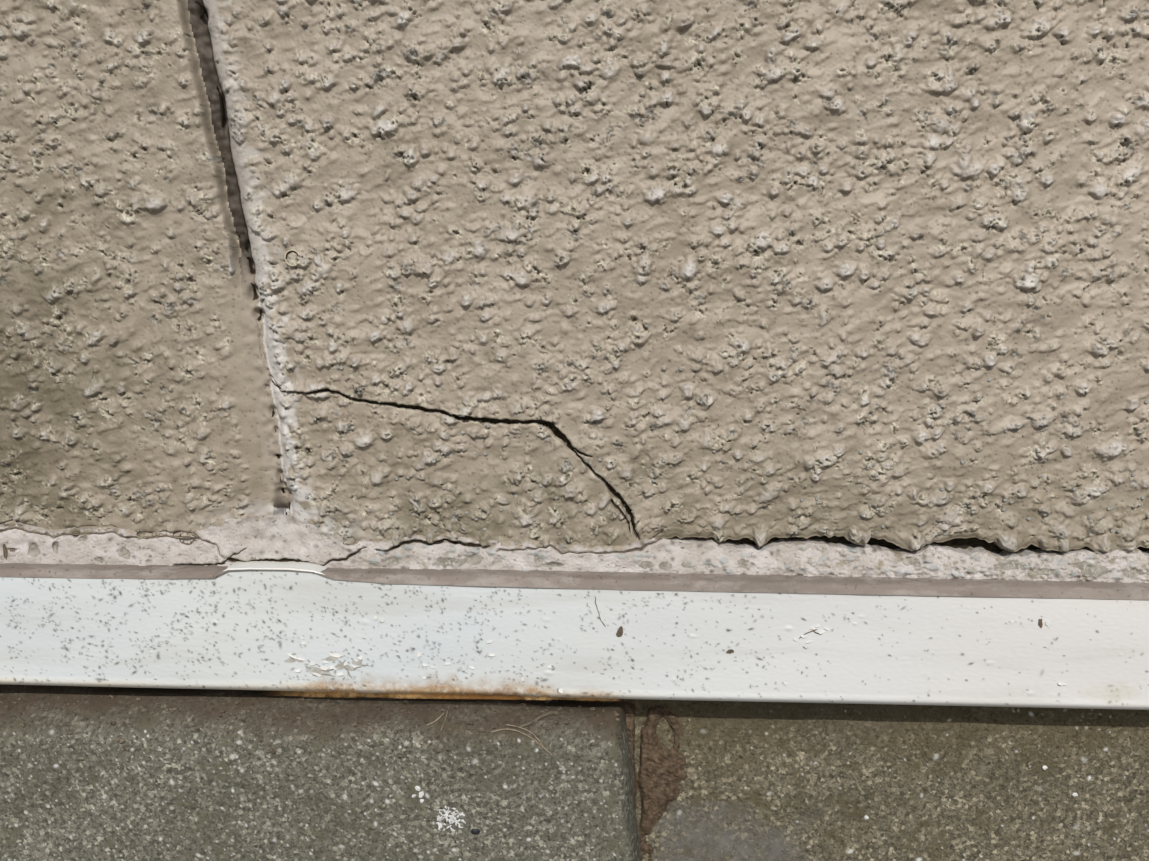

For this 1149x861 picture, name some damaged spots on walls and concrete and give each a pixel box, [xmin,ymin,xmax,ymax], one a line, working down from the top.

crack [0,379,660,566]
rust [397,687,546,700]